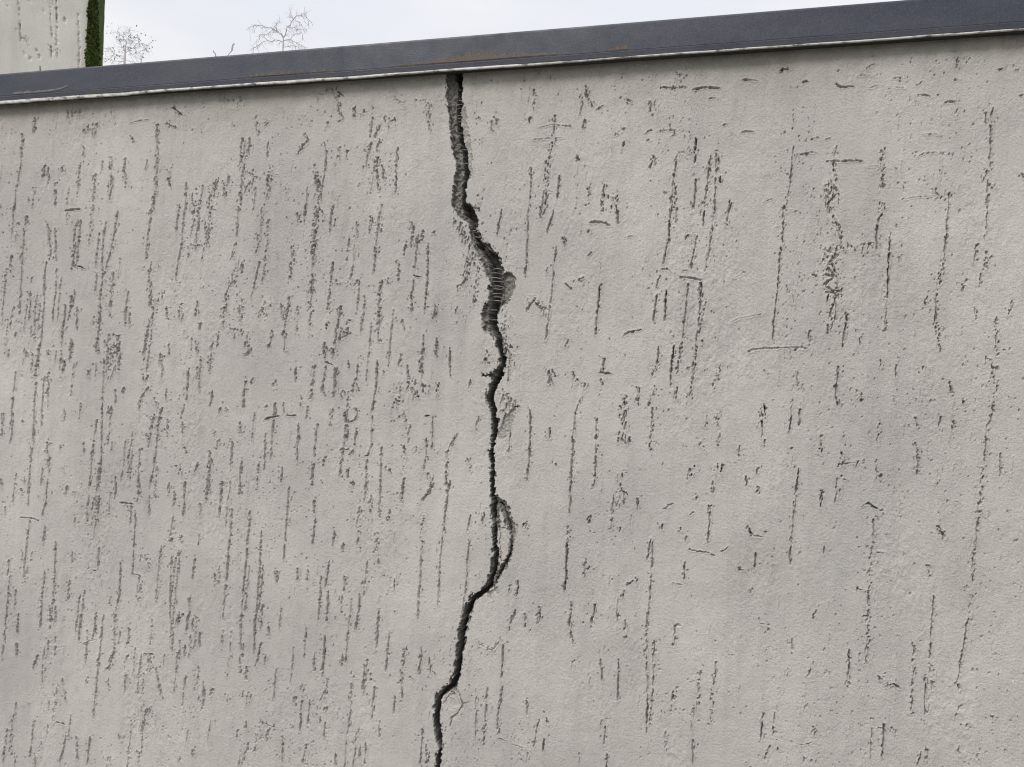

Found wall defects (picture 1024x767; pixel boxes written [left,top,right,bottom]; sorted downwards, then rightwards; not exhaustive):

crack [432,73,519,767]